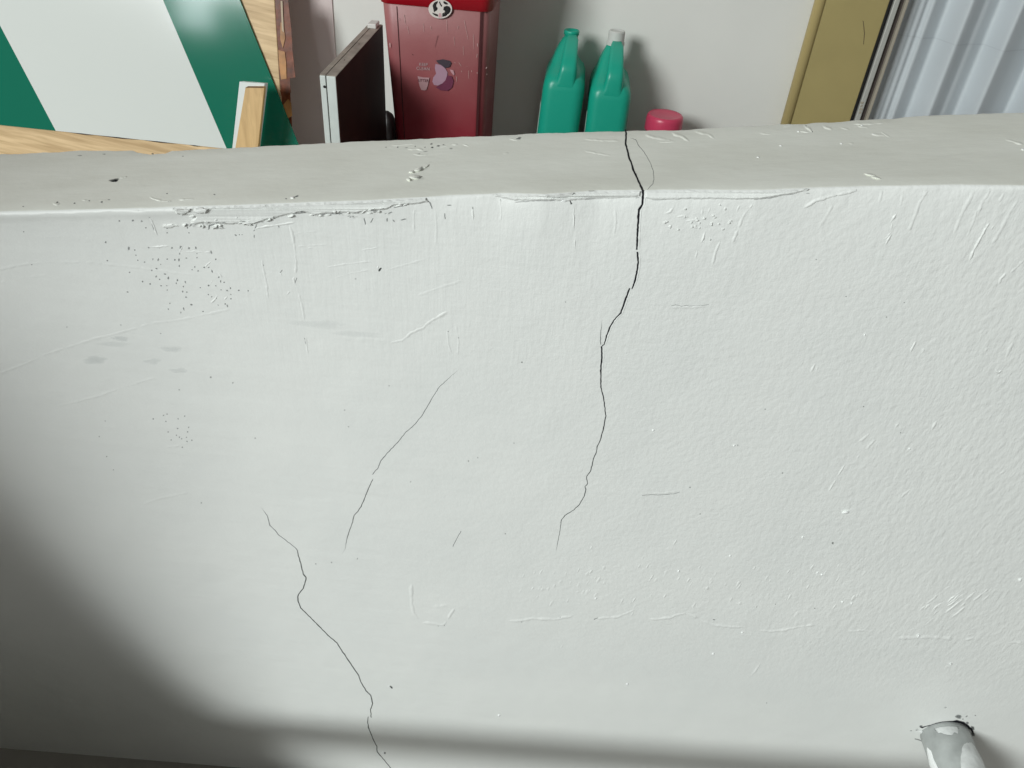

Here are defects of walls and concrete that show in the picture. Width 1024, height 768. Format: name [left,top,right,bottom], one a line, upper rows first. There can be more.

crack [346,379,448,542]
crack [557,129,654,544]
crack [265,513,391,768]